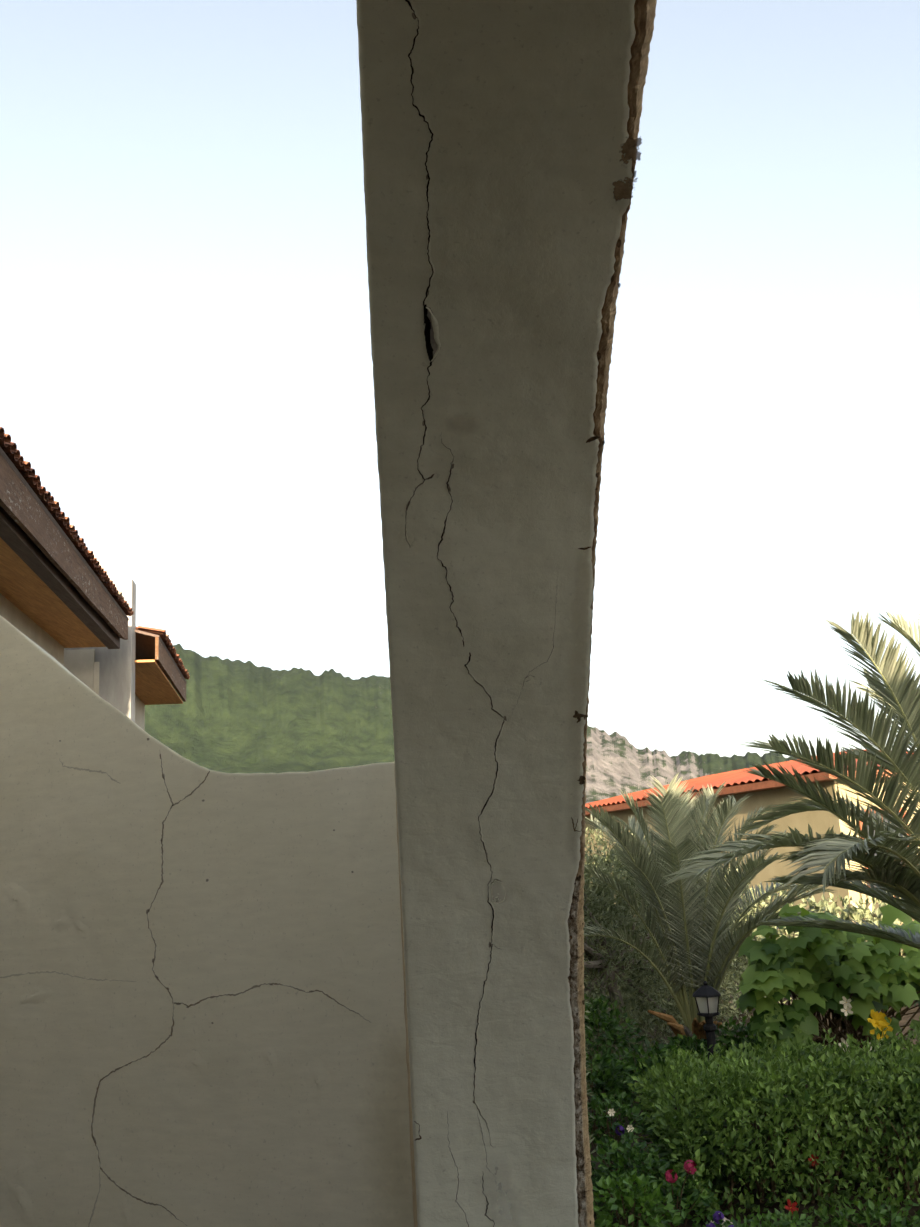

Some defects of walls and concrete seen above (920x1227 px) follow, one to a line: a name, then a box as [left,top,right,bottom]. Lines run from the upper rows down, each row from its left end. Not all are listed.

crack [91,750,371,1226]
crack [405,0,558,1227]
spalling [568,0,657,1227]